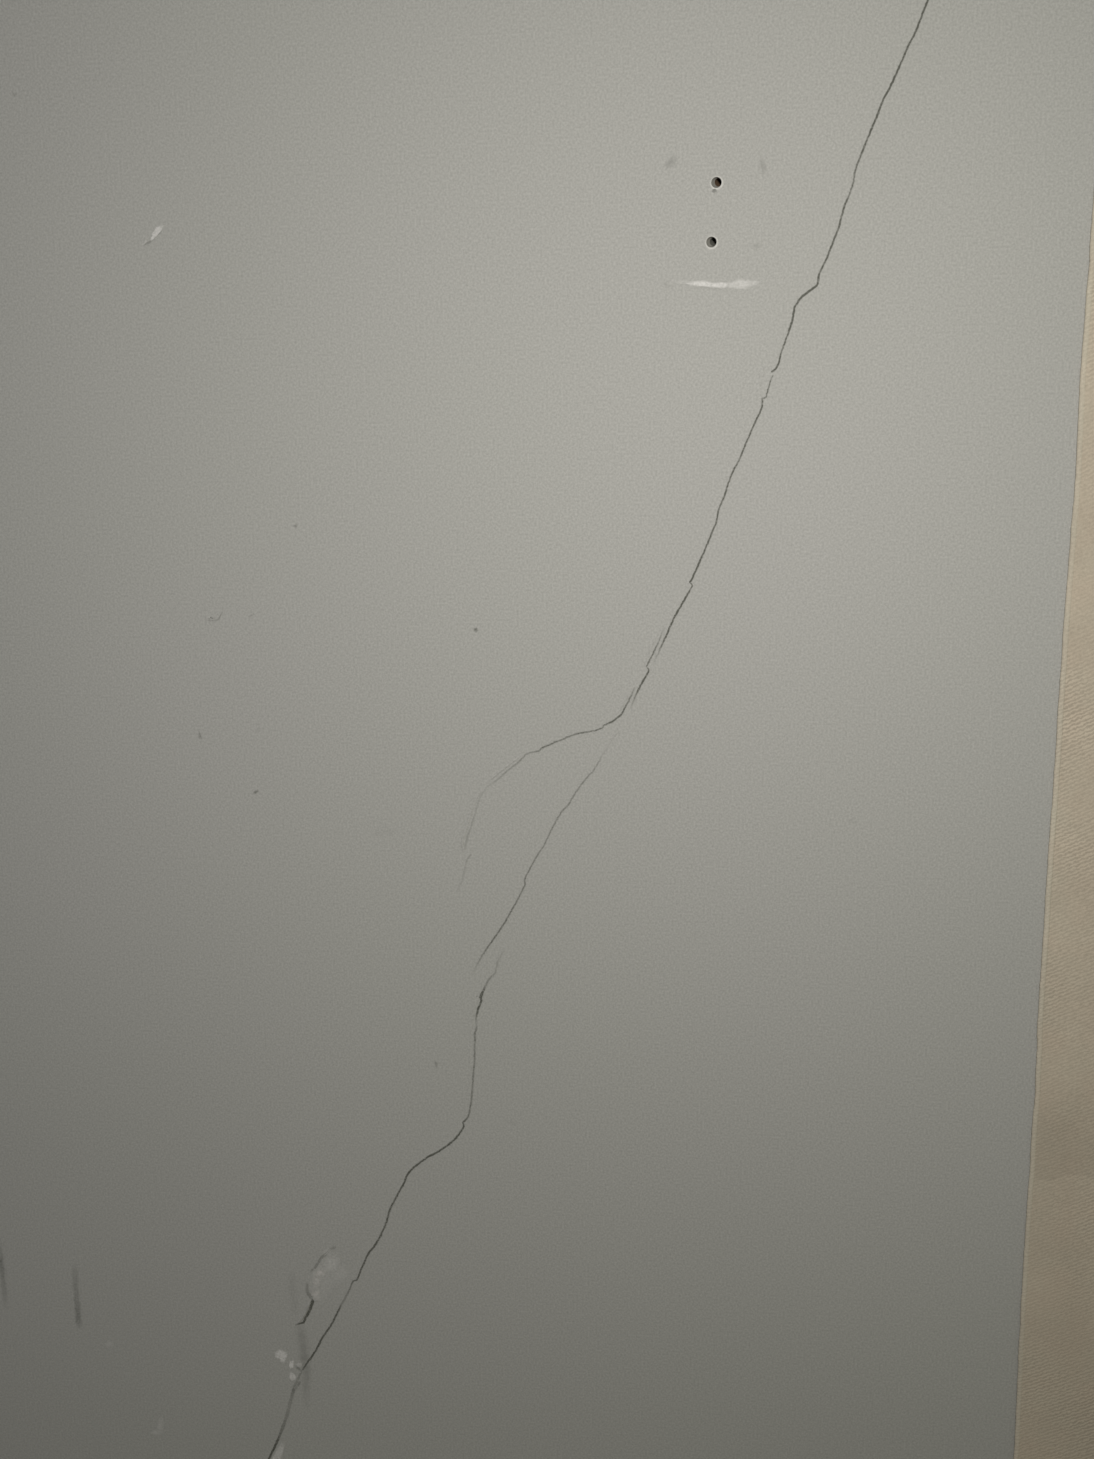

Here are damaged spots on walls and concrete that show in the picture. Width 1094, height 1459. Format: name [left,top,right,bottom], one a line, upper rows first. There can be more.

crack [268,0,929,1459]